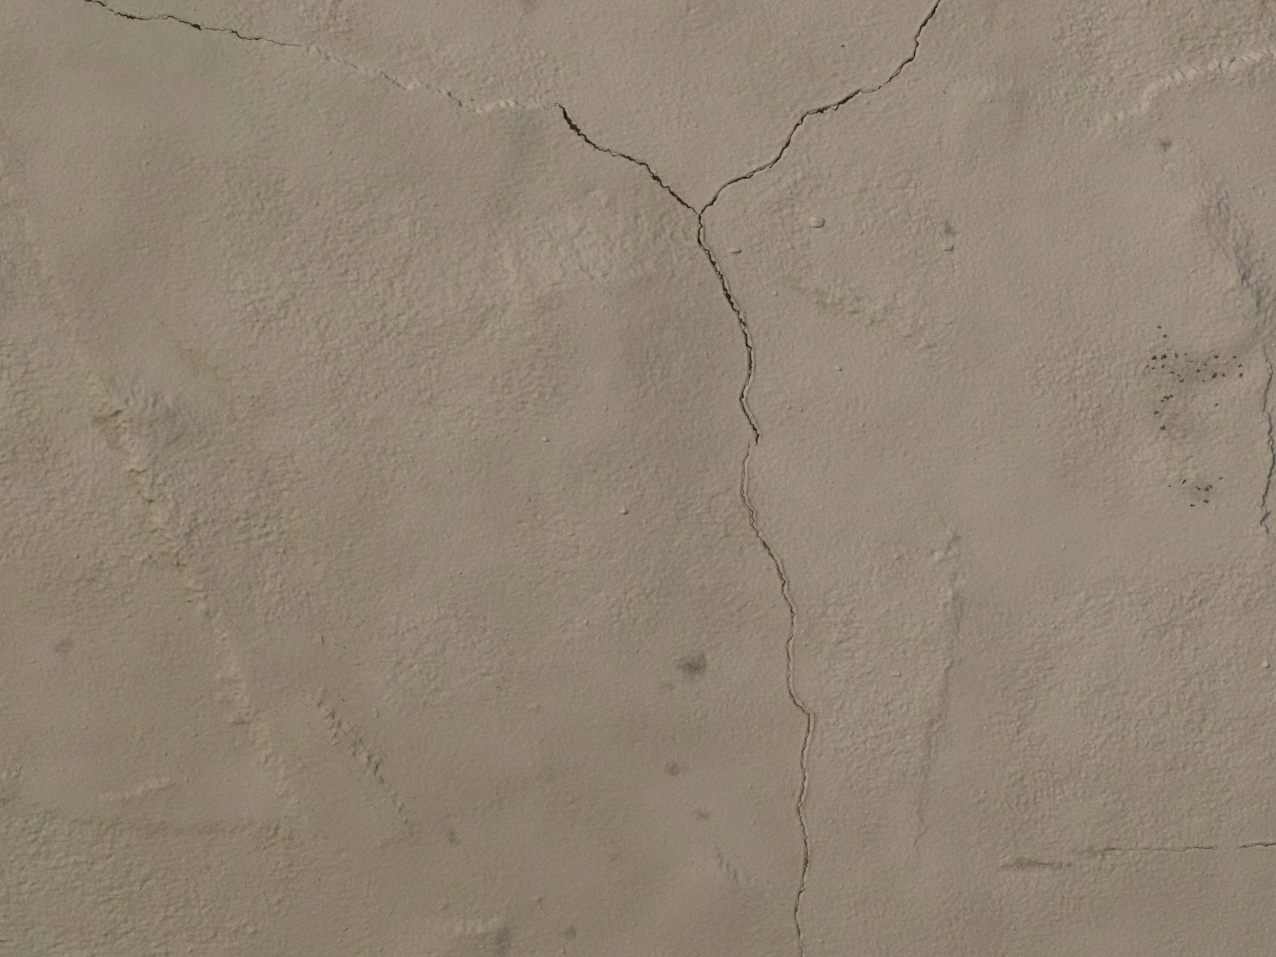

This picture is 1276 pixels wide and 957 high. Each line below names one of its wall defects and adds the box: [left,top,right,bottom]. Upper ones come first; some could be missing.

crack [85,0,300,46]
crack [551,0,940,957]
crack [1104,841,1276,851]